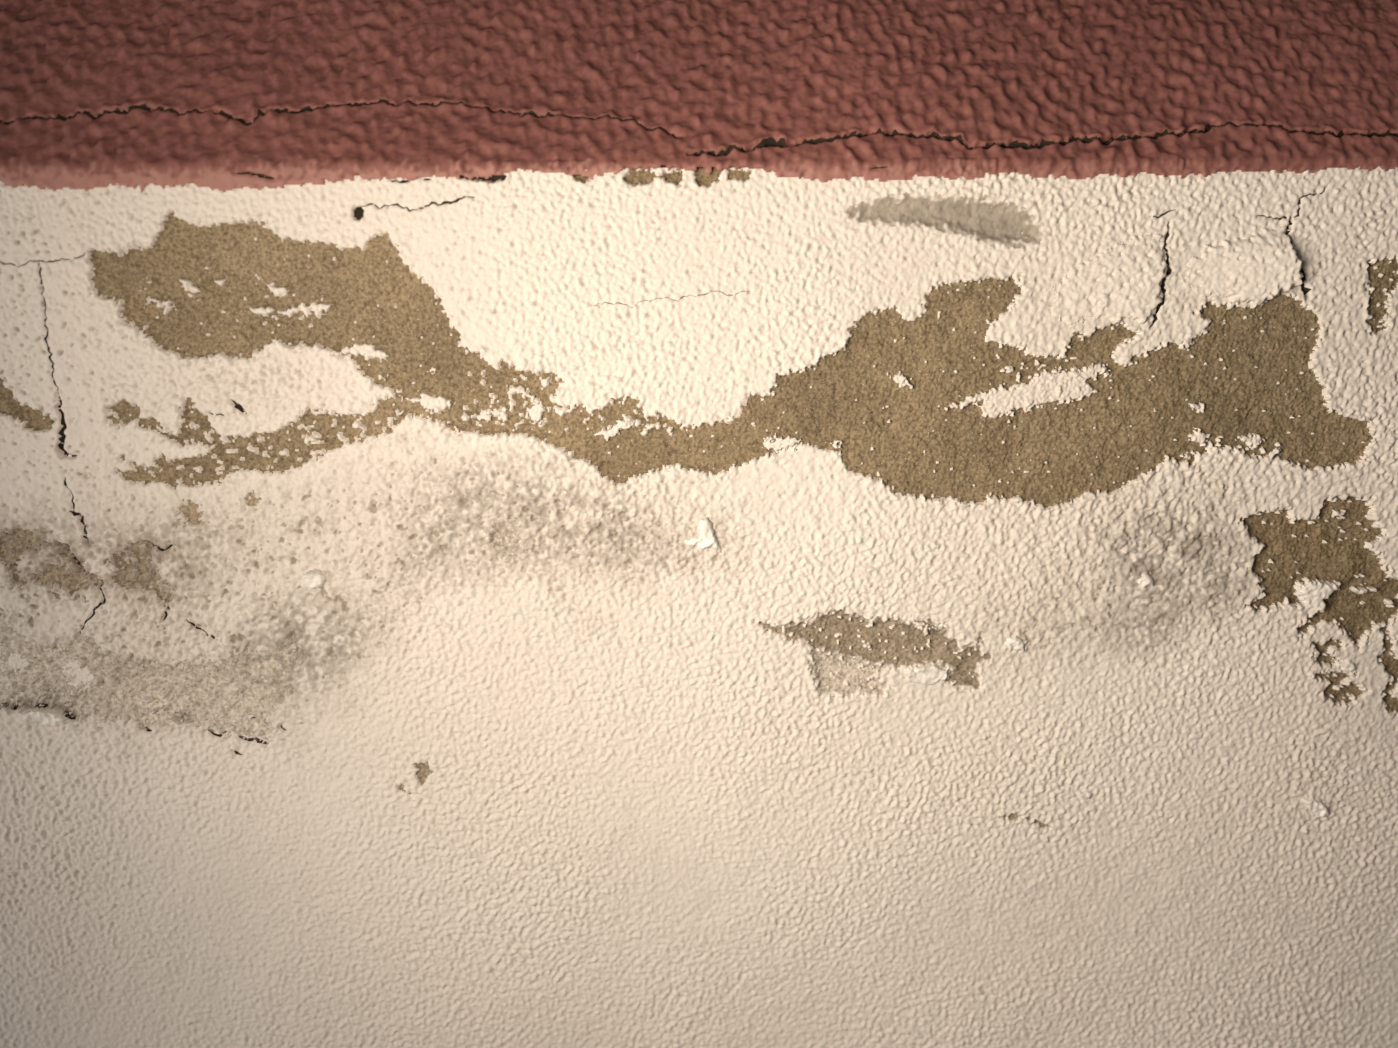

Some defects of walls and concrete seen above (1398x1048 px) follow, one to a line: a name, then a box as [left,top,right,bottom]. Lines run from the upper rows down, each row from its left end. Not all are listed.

crack [236,171,274,179]
crack [0,99,1398,169]
spalling [847,192,1041,249]
crack [1150,210,1174,326]
peeling [1365,257,1398,334]
flaking render [0,378,55,431]
crack [0,253,106,634]
flaking render [90,211,1373,524]
flaking render [0,528,173,610]
flaking render [1240,496,1398,715]
flaking render [759,610,991,694]